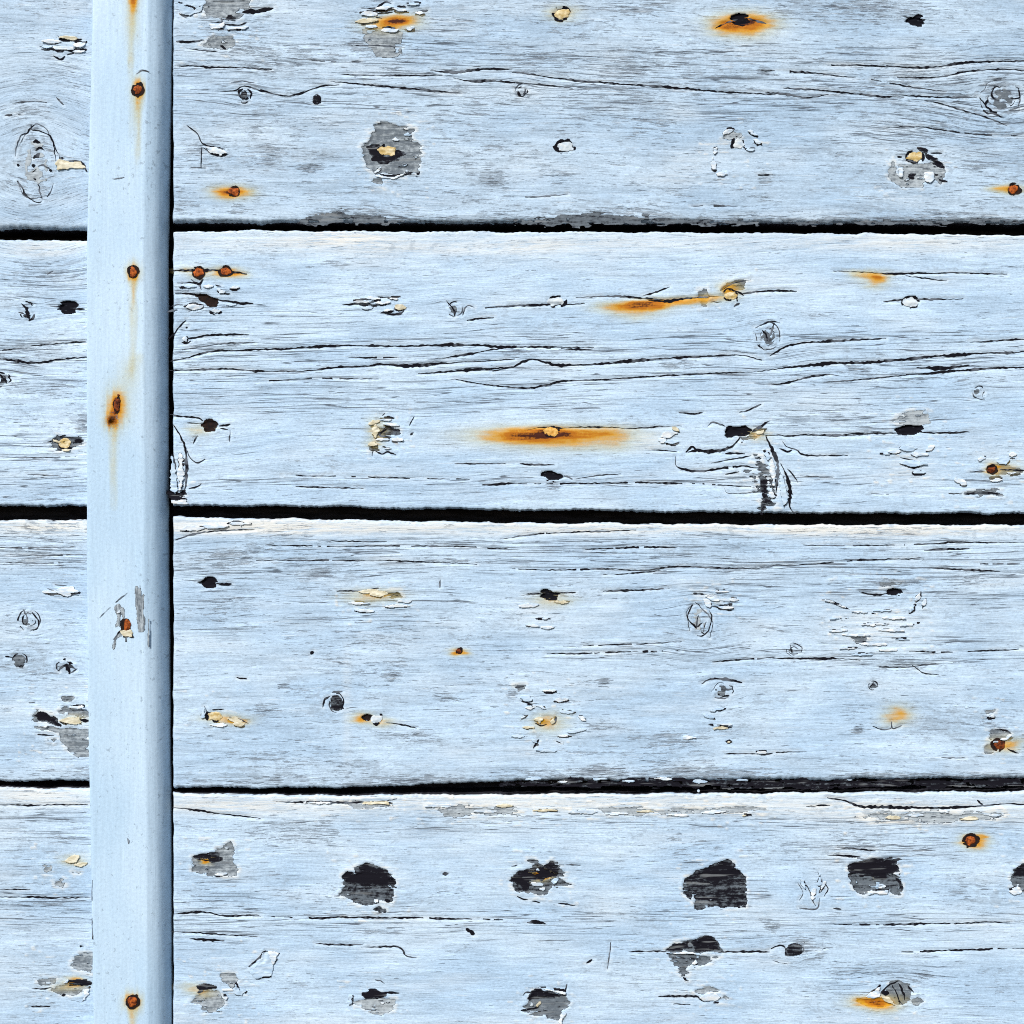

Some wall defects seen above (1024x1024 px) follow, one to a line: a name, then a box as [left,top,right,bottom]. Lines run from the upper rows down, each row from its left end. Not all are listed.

corrosion [374,15,415,29]
corrosion [712,14,774,35]
corrosion [605,284,736,313]
corrosion [105,391,125,429]
corrosion [481,426,626,446]
peeling [337,862,397,913]
peeling [509,859,577,903]
peeling [683,859,748,910]
peeling [836,847,903,895]
peeling [658,935,729,1005]
peeling [521,984,570,1024]
corrosion [855,997,893,1009]